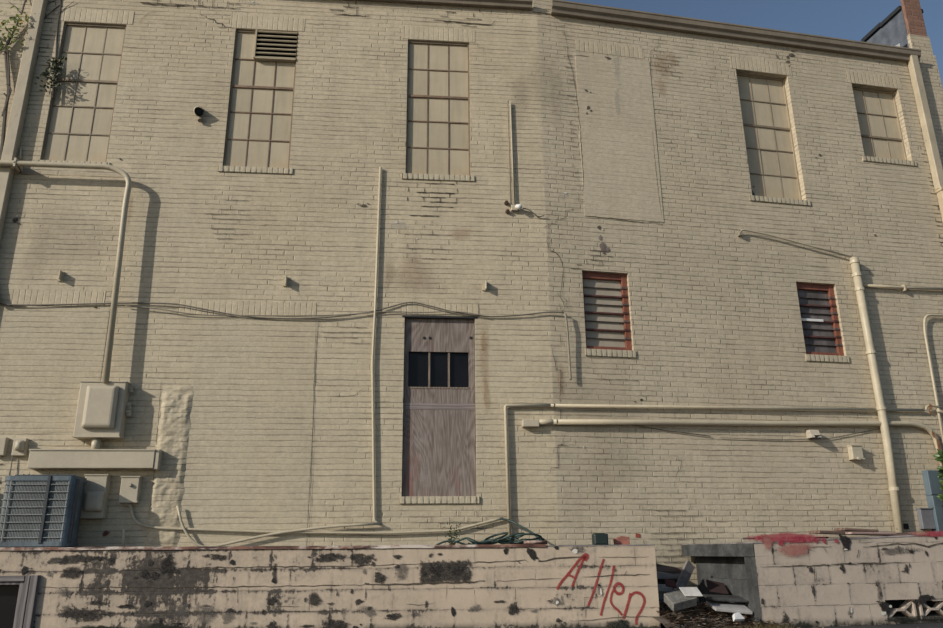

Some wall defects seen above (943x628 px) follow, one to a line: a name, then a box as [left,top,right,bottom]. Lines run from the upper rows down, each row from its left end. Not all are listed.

crack [539,25,663,314]
water stain [607,619,629,628]